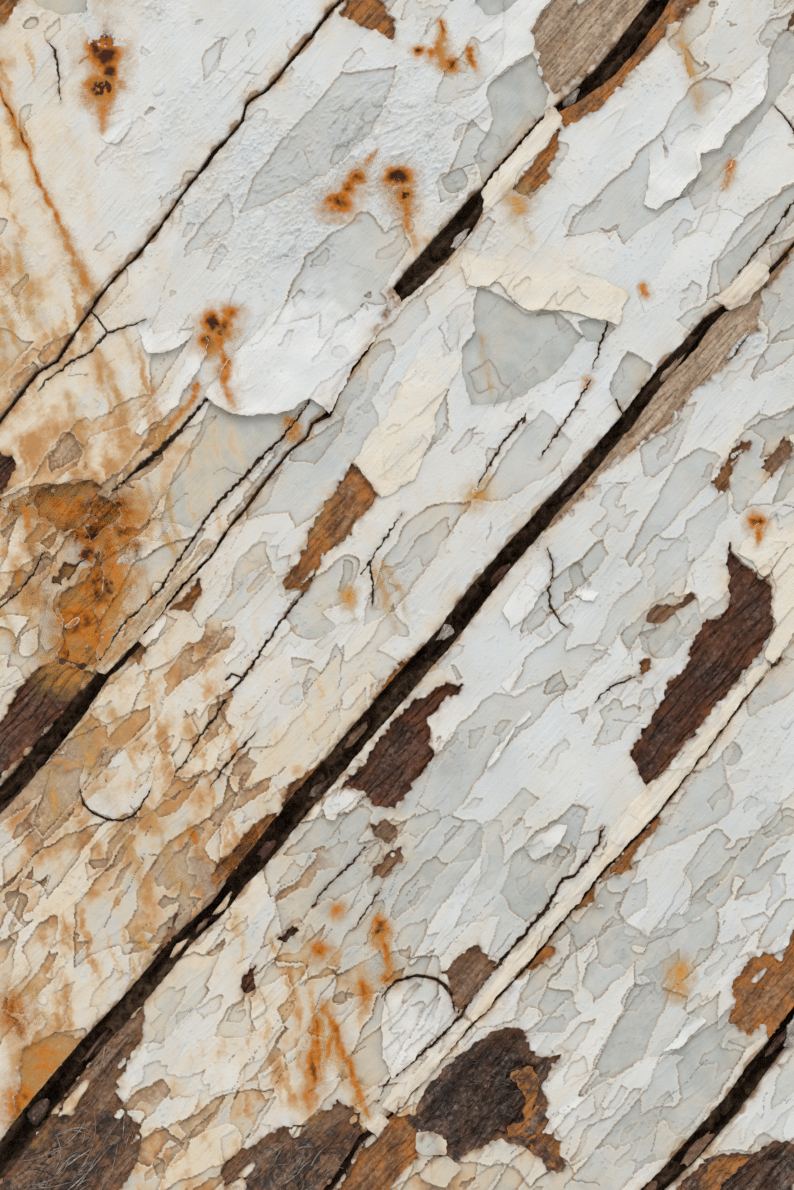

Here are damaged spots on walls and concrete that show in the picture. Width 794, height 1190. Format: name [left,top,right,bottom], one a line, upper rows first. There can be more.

corrosion [81,36,125,133]
peeling [455,0,700,195]
corrosion [381,166,415,245]
crack [40,309,141,389]
corrosion [197,306,239,406]
corrosion [8,492,147,690]
crack [105,398,310,651]
crack [174,592,304,777]
peeling [322,683,462,878]
peeling [630,434,794,786]
crack [378,829,604,1101]
peeling [0,1005,145,1190]